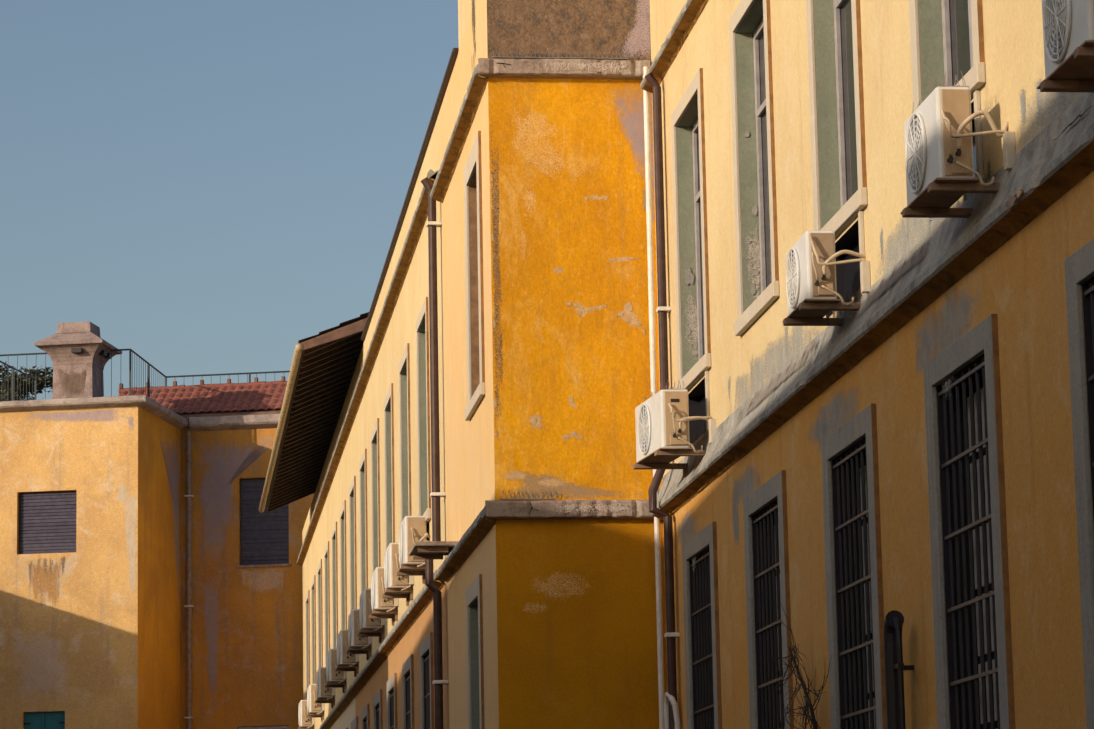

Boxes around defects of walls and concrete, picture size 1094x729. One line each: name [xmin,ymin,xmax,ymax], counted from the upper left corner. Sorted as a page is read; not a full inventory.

peeling [511,106,586,179]